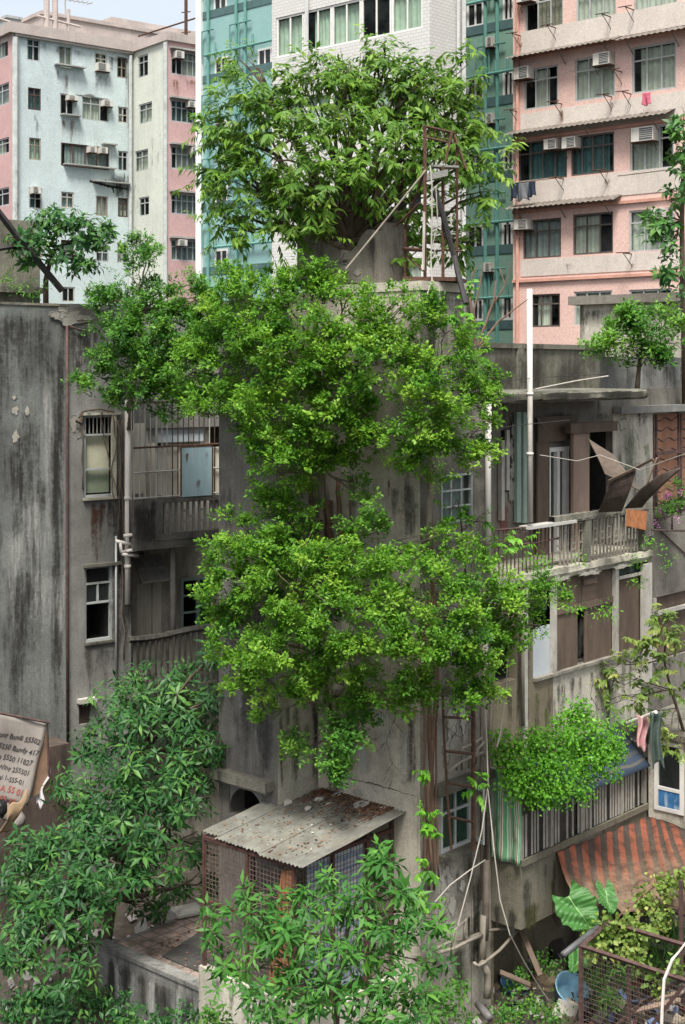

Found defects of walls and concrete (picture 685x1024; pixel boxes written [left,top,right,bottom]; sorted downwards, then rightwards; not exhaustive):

peeling [49,307,96,326]
flaking render [11,394,30,416]
leakage [0,317,97,672]
crack [341,713,416,797]